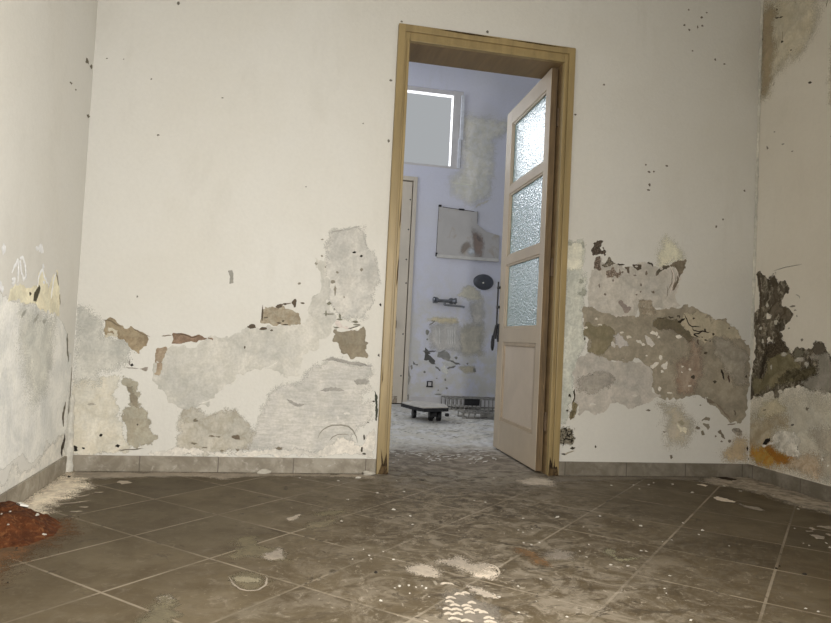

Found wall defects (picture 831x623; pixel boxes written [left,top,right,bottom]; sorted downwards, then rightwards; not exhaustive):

damp [760,0,828,102]
flaking render [0,255,71,470]
flaking render [104,317,150,354]
damp [0,304,376,494]
flaking render [125,226,382,410]
flaking render [407,330,476,399]
flaking render [572,240,751,424]
damp [646,271,831,484]
flaking render [762,424,802,458]